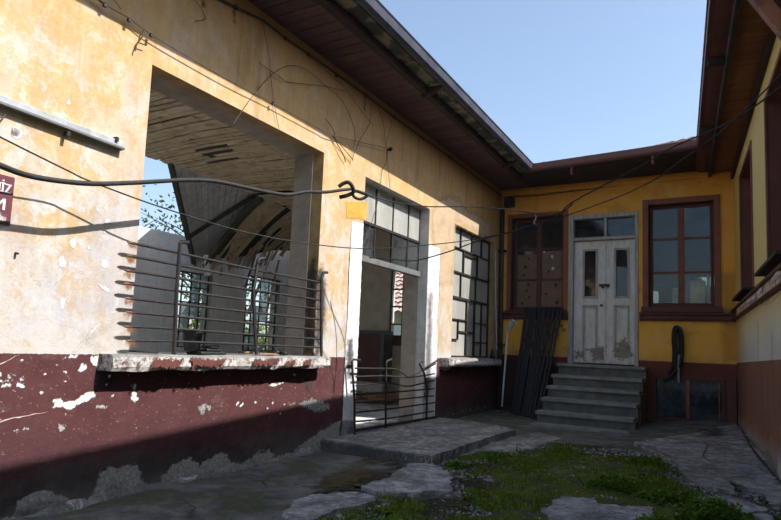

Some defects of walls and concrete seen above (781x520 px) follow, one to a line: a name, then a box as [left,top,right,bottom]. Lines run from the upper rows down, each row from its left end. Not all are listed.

peeling [574,338,633,362]
peeling [65,354,99,372]
peeling [149,356,226,371]
peeling [252,357,312,376]
peeling [52,391,114,410]
spalling [253,420,357,462]
spalling [86,451,242,501]